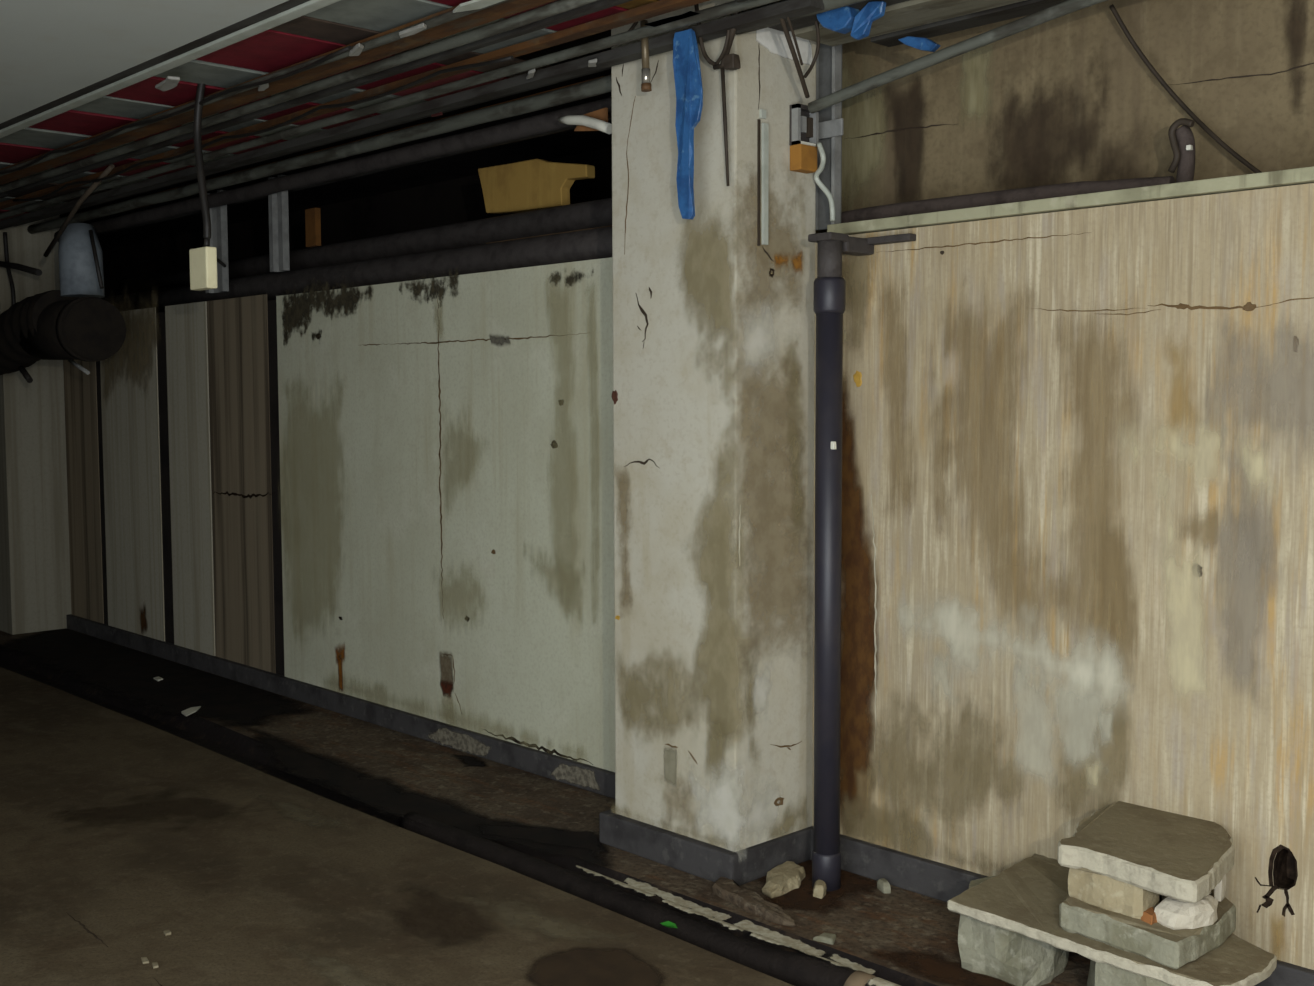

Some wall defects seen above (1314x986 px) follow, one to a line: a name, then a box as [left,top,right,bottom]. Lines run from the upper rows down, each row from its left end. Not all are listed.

leakage [996,94,1097,189]
leakage [282,281,372,344]
leakage [399,270,458,307]
leakage [550,272,593,286]
crack [636,287,652,348]
crack [1032,297,1314,315]
leakage [619,184,807,851]
corrosion [840,383,877,828]
leakage [844,292,1127,859]
leakage [1166,558,1205,693]
corrosion [336,647,345,690]
leakage [526,948,663,986]